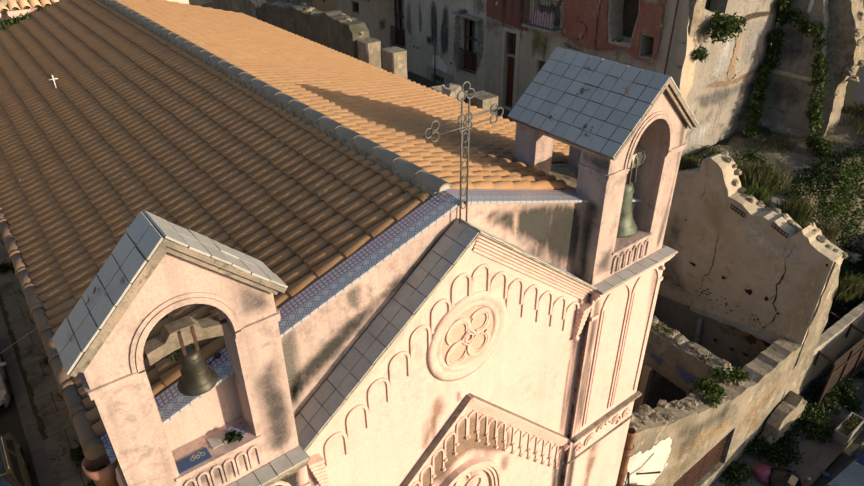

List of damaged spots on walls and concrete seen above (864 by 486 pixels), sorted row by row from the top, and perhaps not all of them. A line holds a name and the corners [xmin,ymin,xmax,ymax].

crack [763,242,794,330]
leakage [489,203,597,486]
leakage [416,417,509,486]
peeling [623,436,672,486]